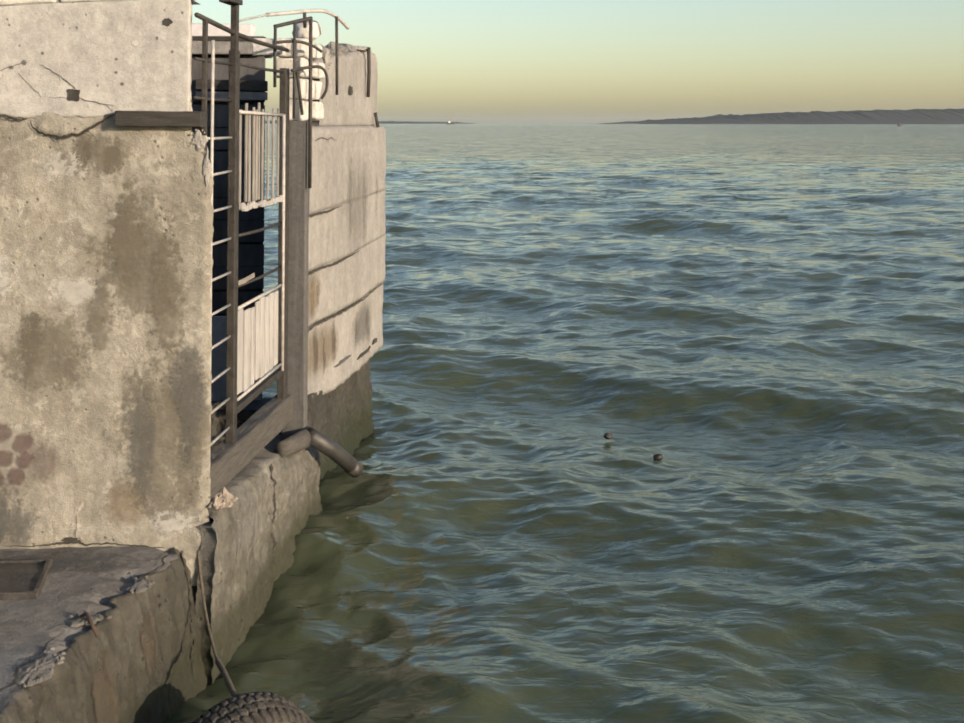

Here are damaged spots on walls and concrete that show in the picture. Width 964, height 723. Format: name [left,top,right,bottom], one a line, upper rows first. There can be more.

crack [0,63,113,145]
water stain [128,390,154,491]
water stain [170,347,205,451]
spalling [17,647,66,688]